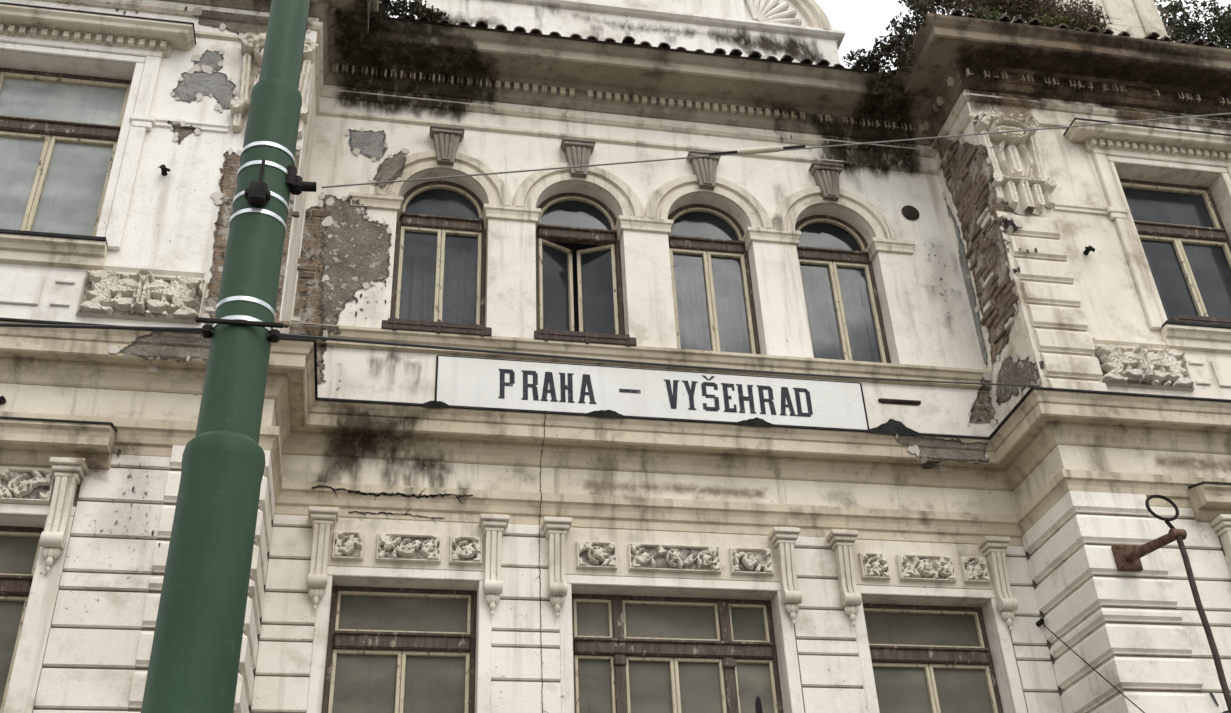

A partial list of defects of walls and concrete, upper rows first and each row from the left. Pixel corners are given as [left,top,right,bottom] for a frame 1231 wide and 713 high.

spalling [170,49,237,112]
spalling [176,7,269,39]
damp [333,0,496,120]
damp [621,25,822,63]
spalling [167,120,201,144]
spalling [345,128,410,188]
damp [774,78,921,175]
spalling [202,148,242,325]
spalling [275,192,392,384]
spalling [932,136,1044,428]
damp [324,406,445,483]
crack [312,485,473,524]